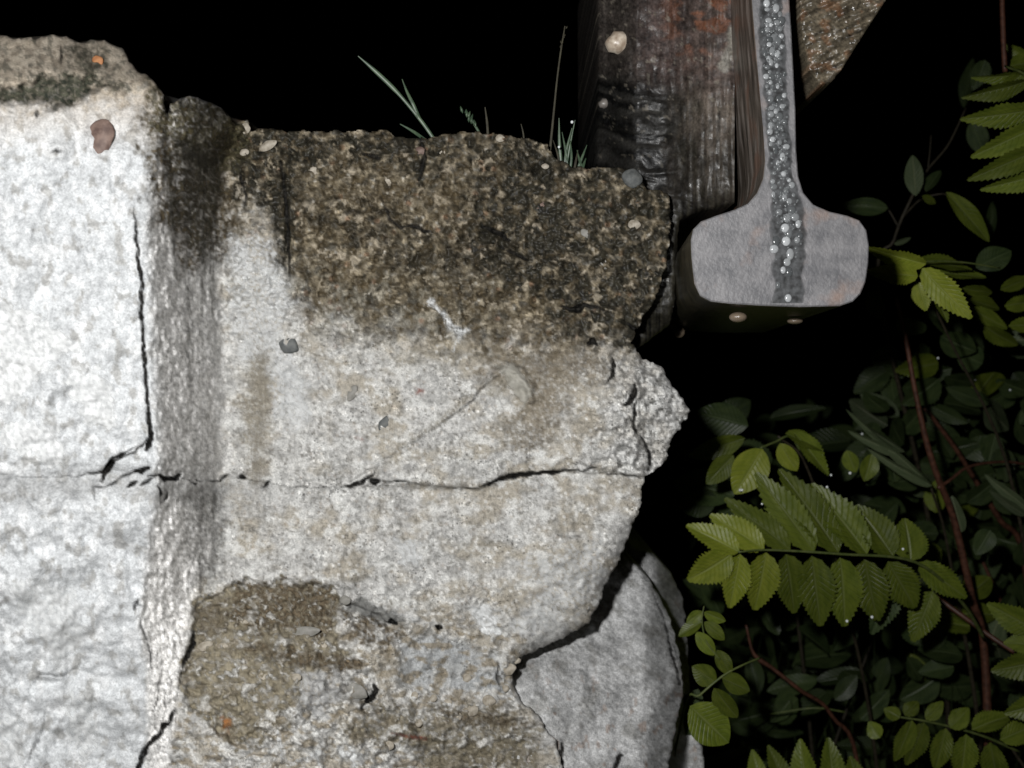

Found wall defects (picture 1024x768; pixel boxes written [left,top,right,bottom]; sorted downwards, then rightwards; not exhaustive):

water stain [136,93,671,469]
crack [88,214,270,501]
crack [344,475,403,488]
crack [483,466,596,486]
crack [182,631,196,668]
spalling [179,574,407,752]
crack [665,626,680,685]
crack [136,696,175,768]
spalling [344,700,543,768]
crack [557,742,565,768]
crack [613,754,623,768]